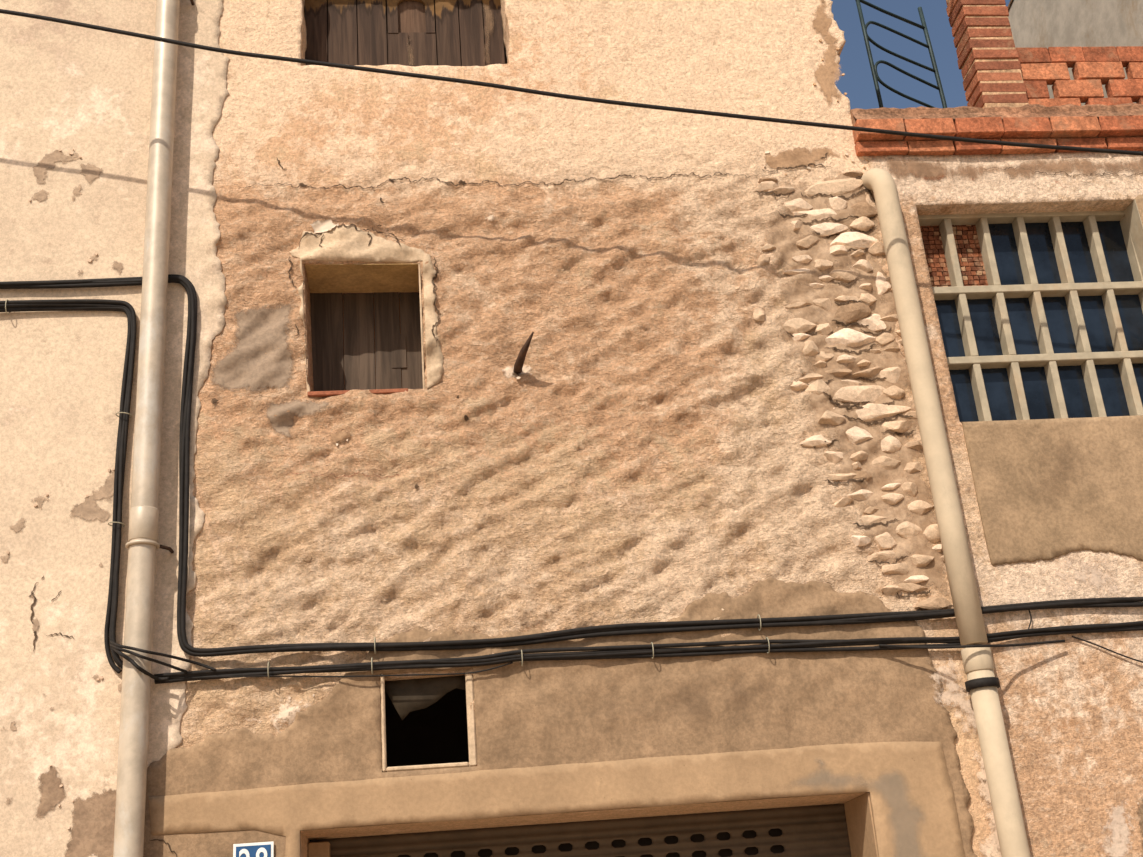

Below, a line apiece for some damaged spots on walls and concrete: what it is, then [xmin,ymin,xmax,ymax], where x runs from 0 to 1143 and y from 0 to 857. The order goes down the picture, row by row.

flaking render [812,0,847,103]
peeling [29,149,102,202]
crack [230,153,831,288]
crack [856,176,876,204]
crack [431,256,440,343]
flaking render [764,147,948,596]
crack [29,575,73,651]
peeling [36,765,116,857]